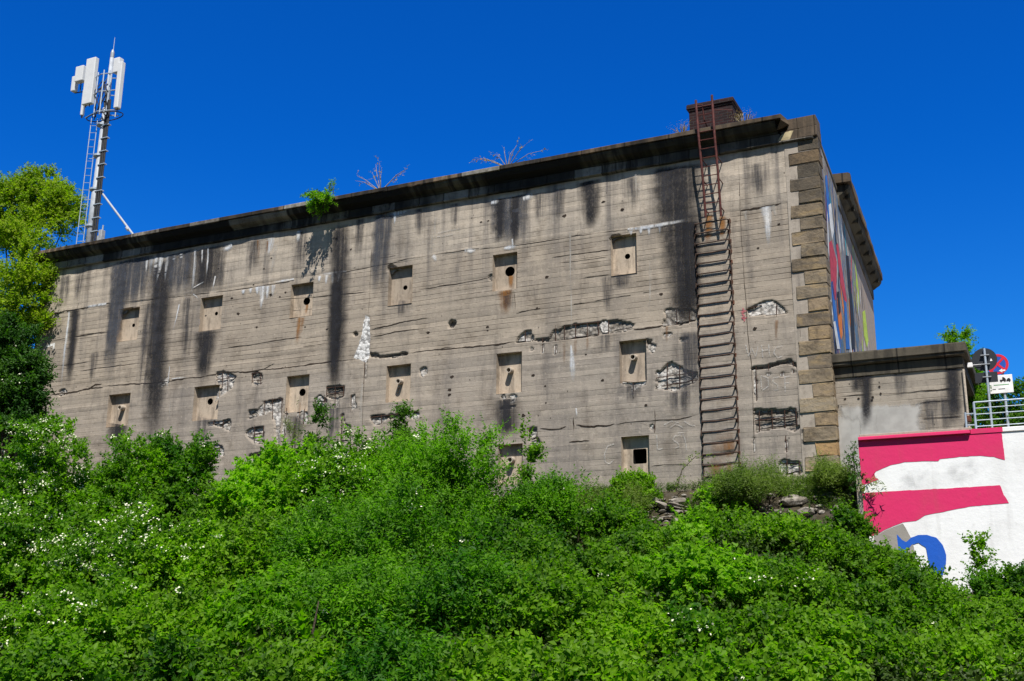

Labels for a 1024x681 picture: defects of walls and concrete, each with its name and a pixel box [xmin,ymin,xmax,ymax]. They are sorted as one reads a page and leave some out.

leakage [490,194,541,249]
leakage [581,180,599,223]
leakage [628,166,698,307]
leakage [90,244,232,421]
leakage [318,219,362,373]
spalling [516,320,634,355]
spalling [623,362,698,392]
leakage [672,333,697,404]
spalling [747,301,787,330]
spalling [208,419,231,431]
spalling [247,384,357,461]
spalling [752,360,803,475]